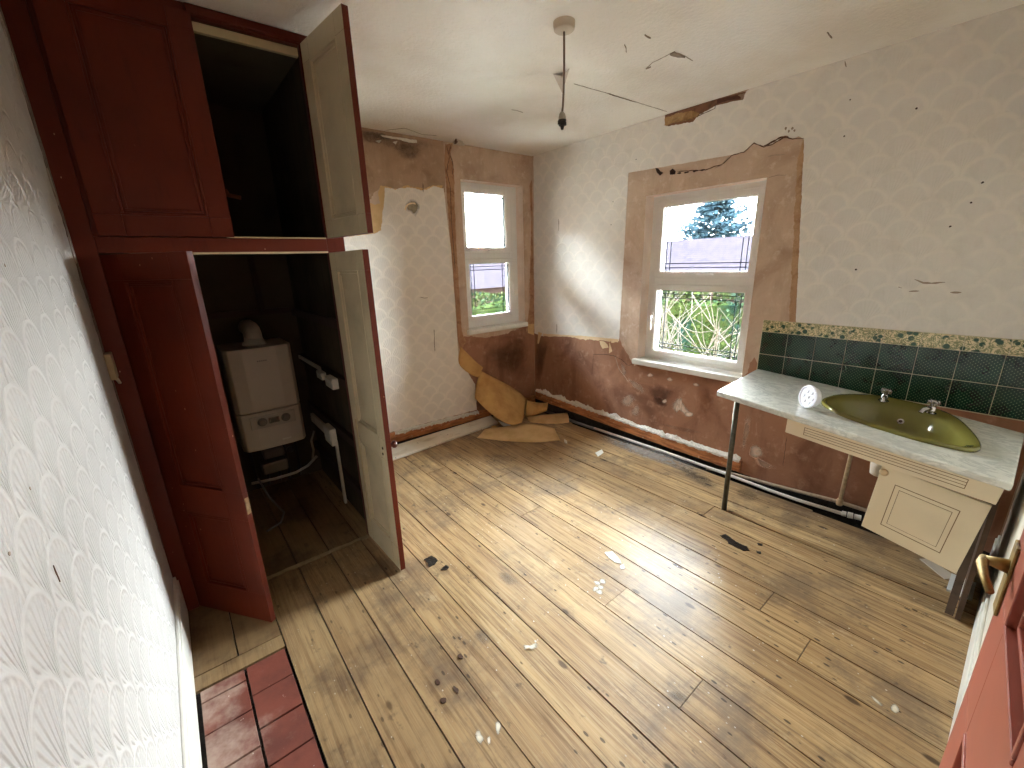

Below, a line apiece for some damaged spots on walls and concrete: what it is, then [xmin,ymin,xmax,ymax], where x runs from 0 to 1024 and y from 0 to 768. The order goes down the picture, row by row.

peeling [376,135,417,145]
spalling [665,92,746,126]
spalling [444,139,467,348]
spalling [526,181,542,344]
spalling [785,127,804,322]
spalling [535,389,741,462]
damp [622,366,693,416]